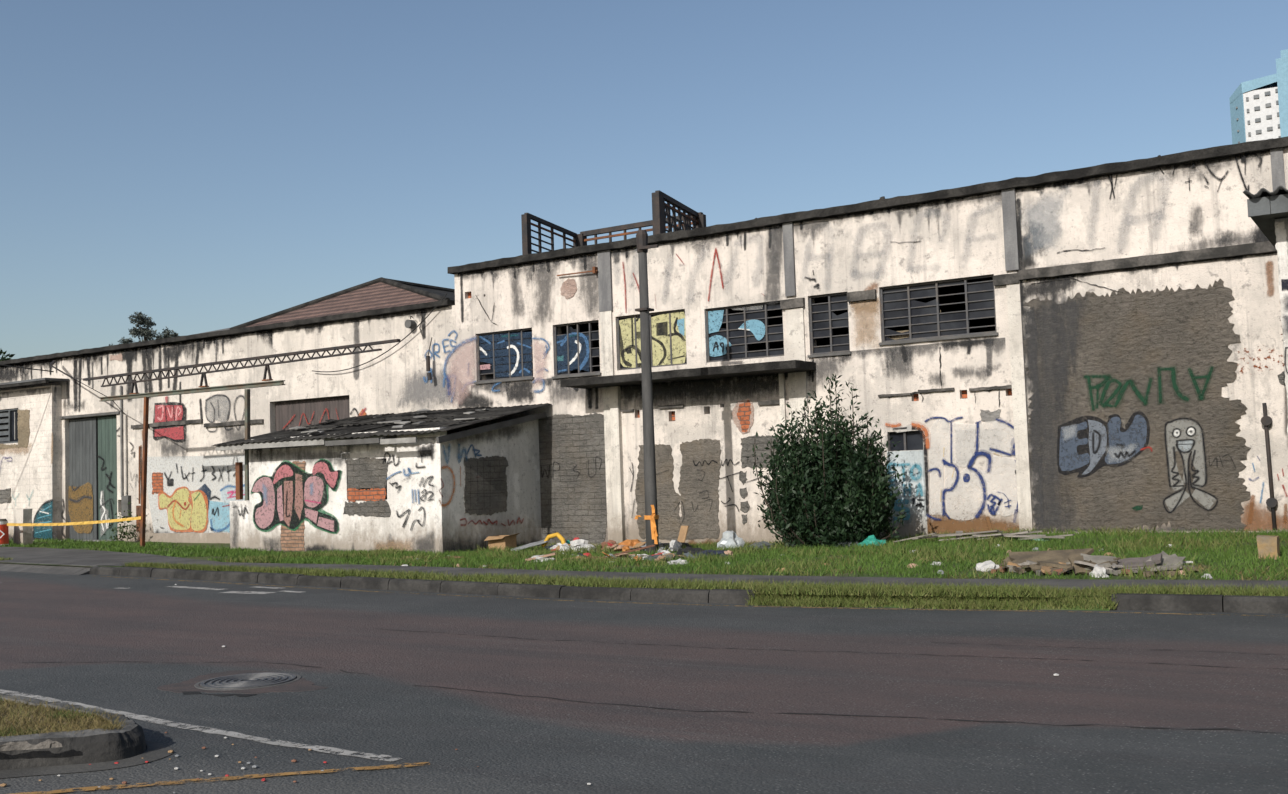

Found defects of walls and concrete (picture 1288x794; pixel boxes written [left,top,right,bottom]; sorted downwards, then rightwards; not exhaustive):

water stain [0,150,1277,532]
water stain [417,534,488,552]